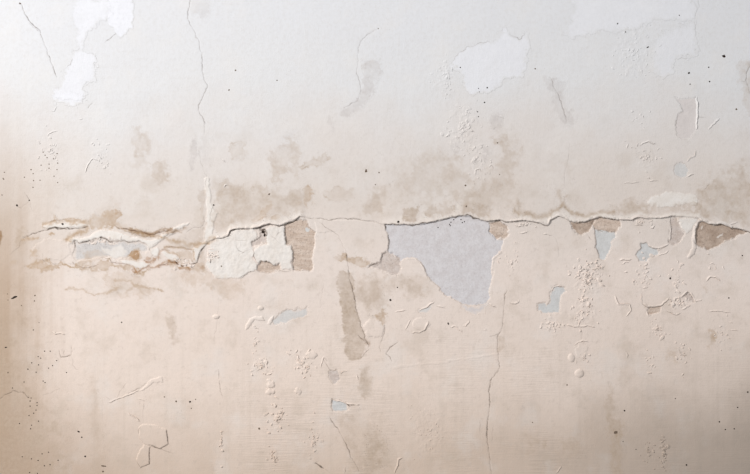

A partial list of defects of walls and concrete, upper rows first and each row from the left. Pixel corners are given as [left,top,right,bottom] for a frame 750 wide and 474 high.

flaking render [33,236,149,262]
water stain [0,112,750,302]
flaking render [204,205,748,316]
water stain [331,252,433,474]